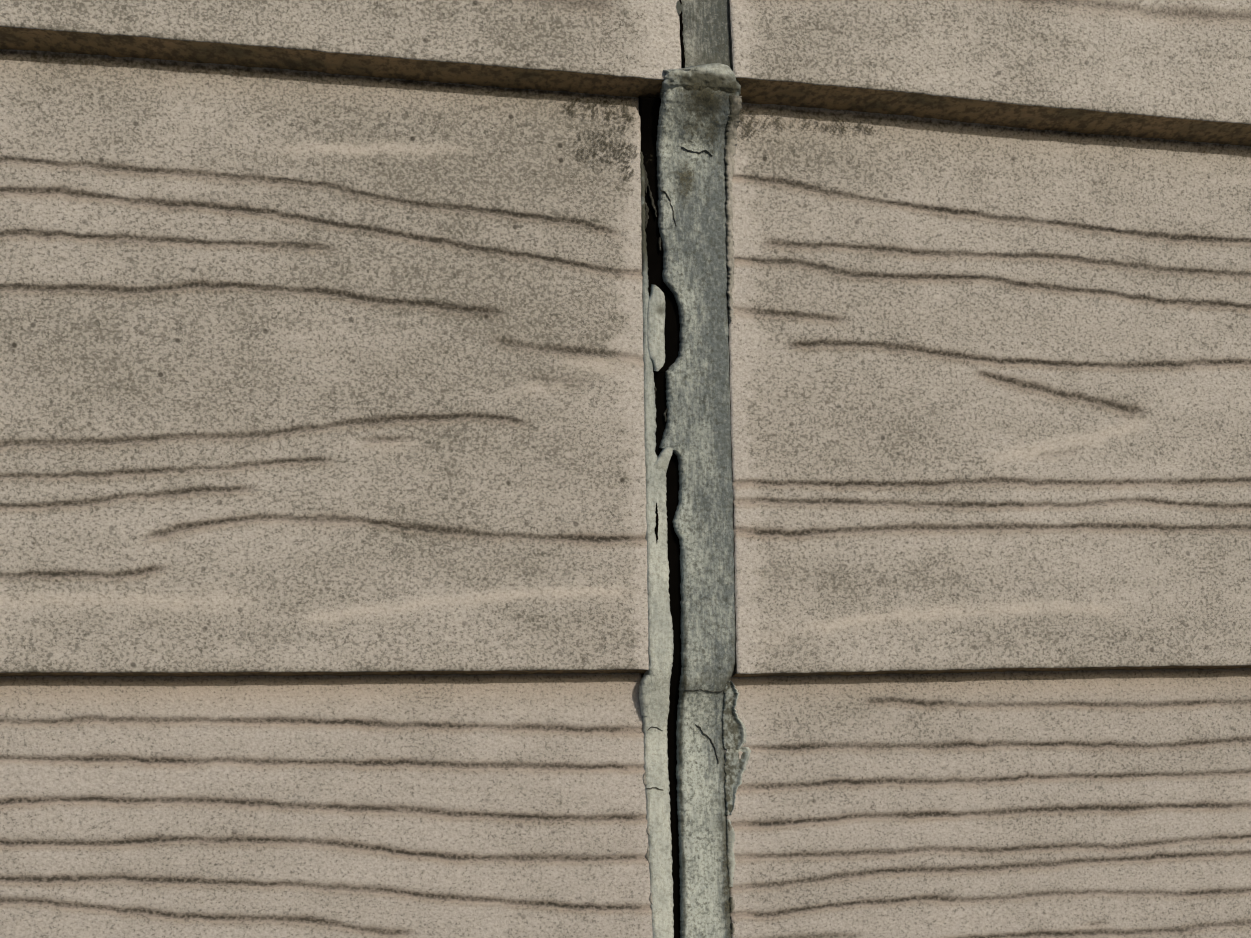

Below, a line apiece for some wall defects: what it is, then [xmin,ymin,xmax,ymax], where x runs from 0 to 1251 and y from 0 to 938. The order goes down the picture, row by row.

peeling [647,284,665,371]
peeling [653,447,673,472]
crack [639,97,724,938]
peeling [722,681,751,934]